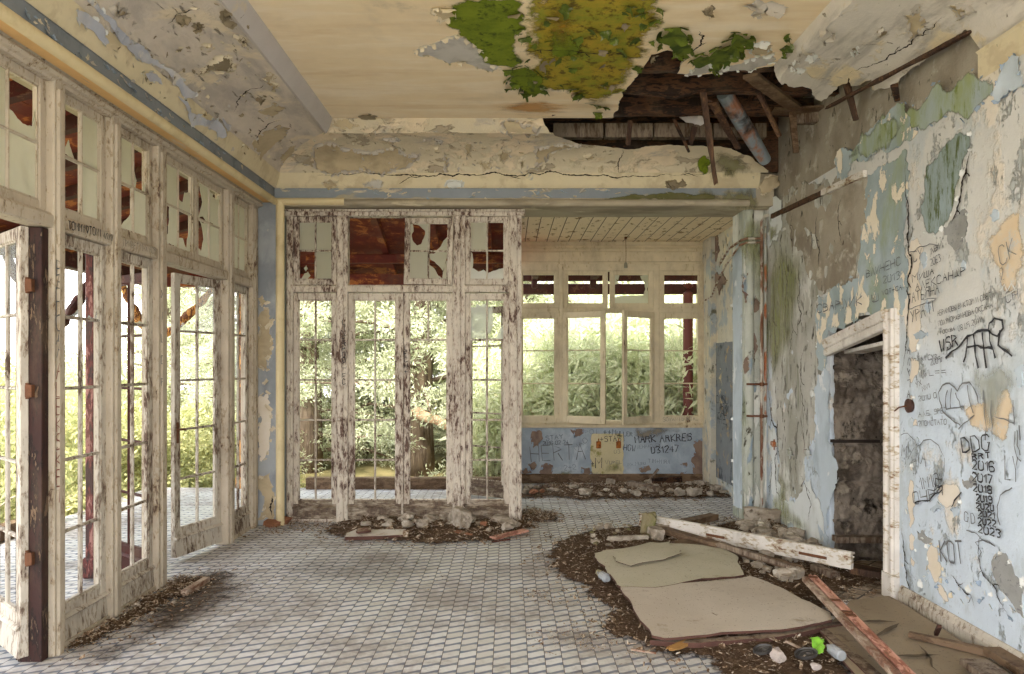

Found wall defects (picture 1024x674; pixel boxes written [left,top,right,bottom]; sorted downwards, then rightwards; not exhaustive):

peeling [76,0,297,166]
crack [850,18,941,73]
peeling [971,53,1024,113]
peeling [310,118,595,199]
crack [329,152,703,187]
peeling [663,179,687,199]
peeling [987,209,1024,292]
flaking render [715,101,968,545]
peeling [258,295,276,462]
peeling [966,364,1024,440]
flaking render [676,438,703,474]
flaking render [905,463,1024,622]